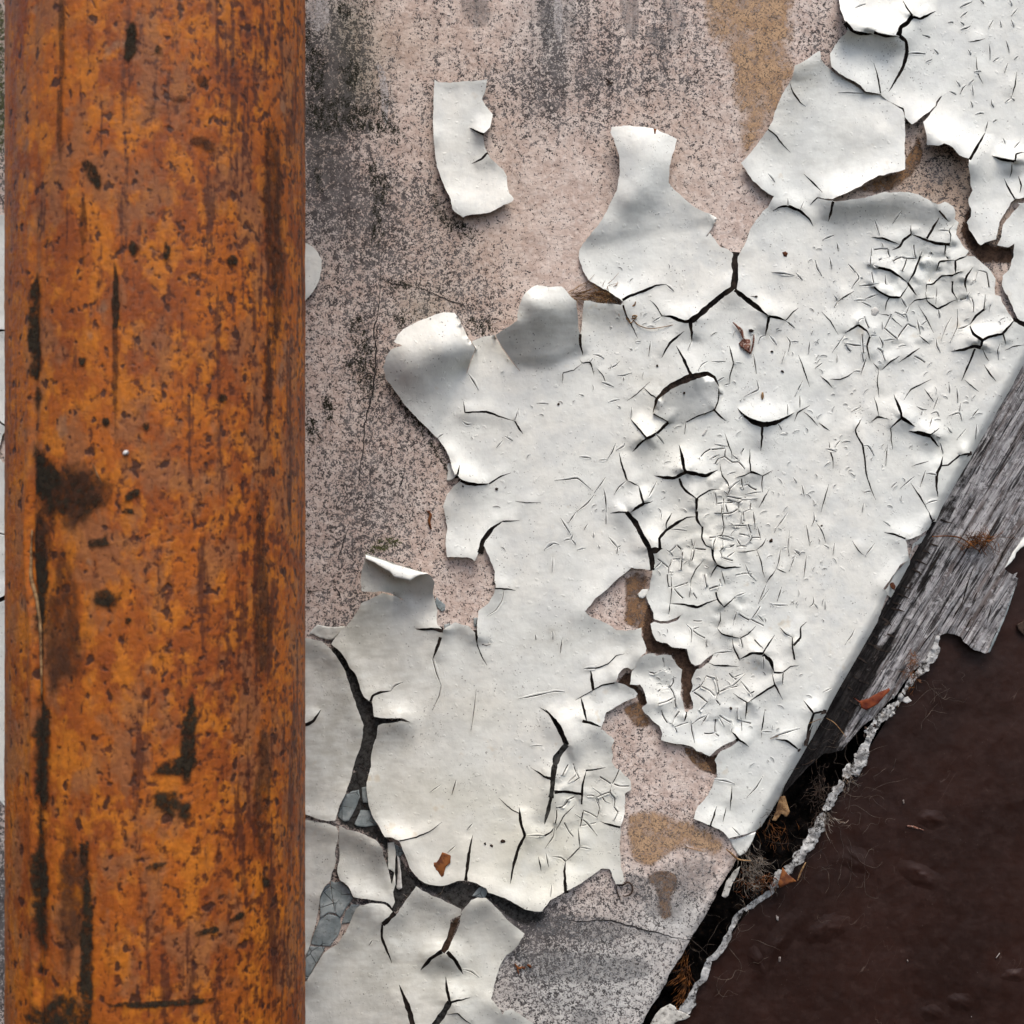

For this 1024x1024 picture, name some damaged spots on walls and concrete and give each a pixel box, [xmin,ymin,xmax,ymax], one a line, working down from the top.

leakage [305,0,405,147]
leakage [363,153,392,254]
leakage [305,395,334,445]
leakage [341,313,460,480]
crack [338,251,474,558]
leakage [468,314,497,337]
peeling [305,0,1024,1024]
crack [438,173,1024,828]
crack [417,627,443,710]
crack [464,823,473,881]
crack [499,654,695,949]
crack [368,912,479,1024]